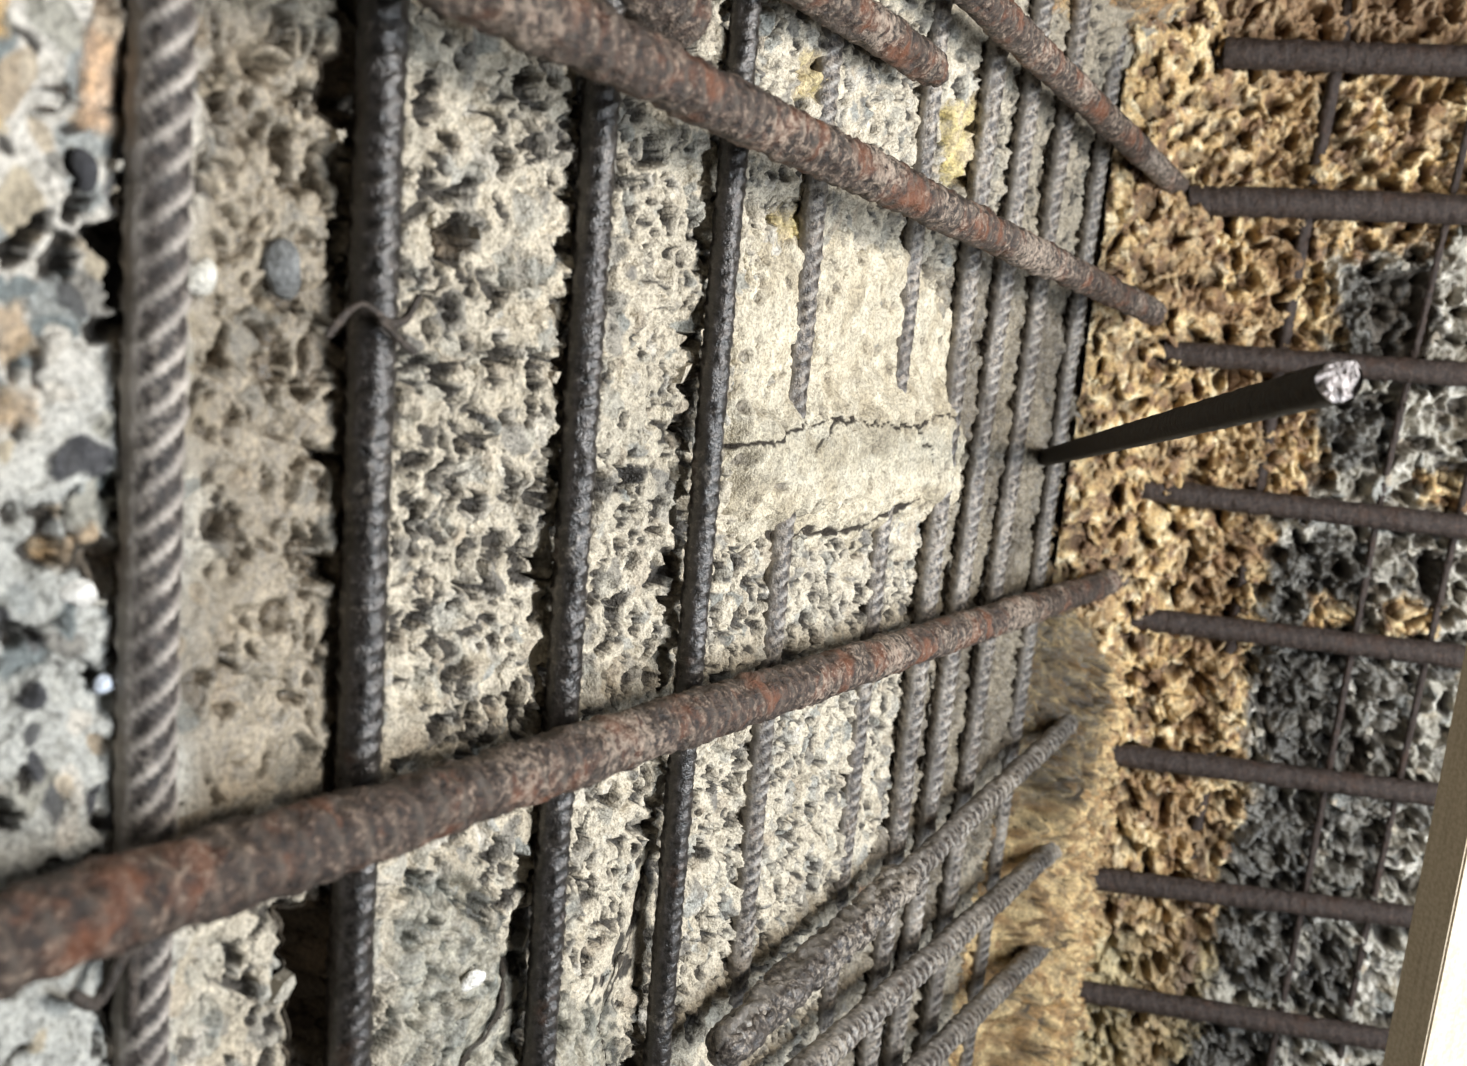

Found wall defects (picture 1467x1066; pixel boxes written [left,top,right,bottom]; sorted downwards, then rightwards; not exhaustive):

corrosion [793,50,824,99]
corrosion [939,96,978,185]
corrosion [1071,0,1467,440]
spalling [417,0,1467,694]
crack [724,413,957,463]
corrosion [1411,467,1467,514]
corrosion [24,524,99,566]
spalling [0,0,1129,1066]
crack [765,498,920,550]
corrosion [1303,591,1355,629]
corrosion [1380,595,1448,639]
corrosion [948,409,1335,1066]